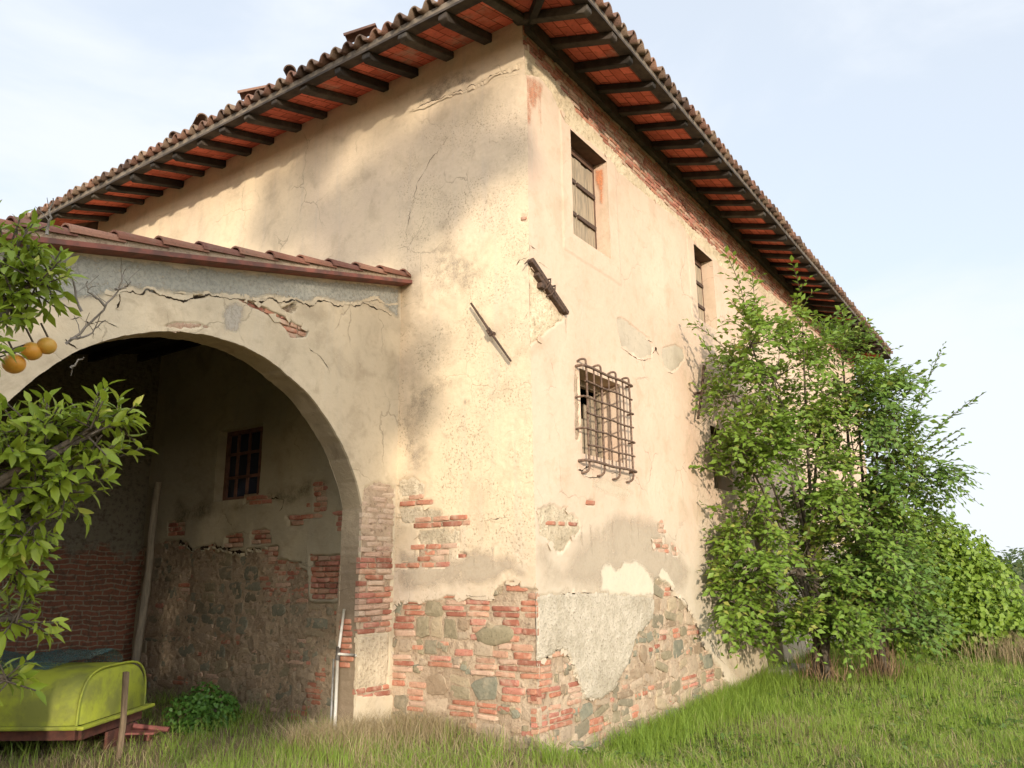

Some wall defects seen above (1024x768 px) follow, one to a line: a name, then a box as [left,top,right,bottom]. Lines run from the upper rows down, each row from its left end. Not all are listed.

crack [65,286,398,349]
spalling [239,298,308,338]
flaking render [523,25,855,371]
flaking render [139,477,727,757]